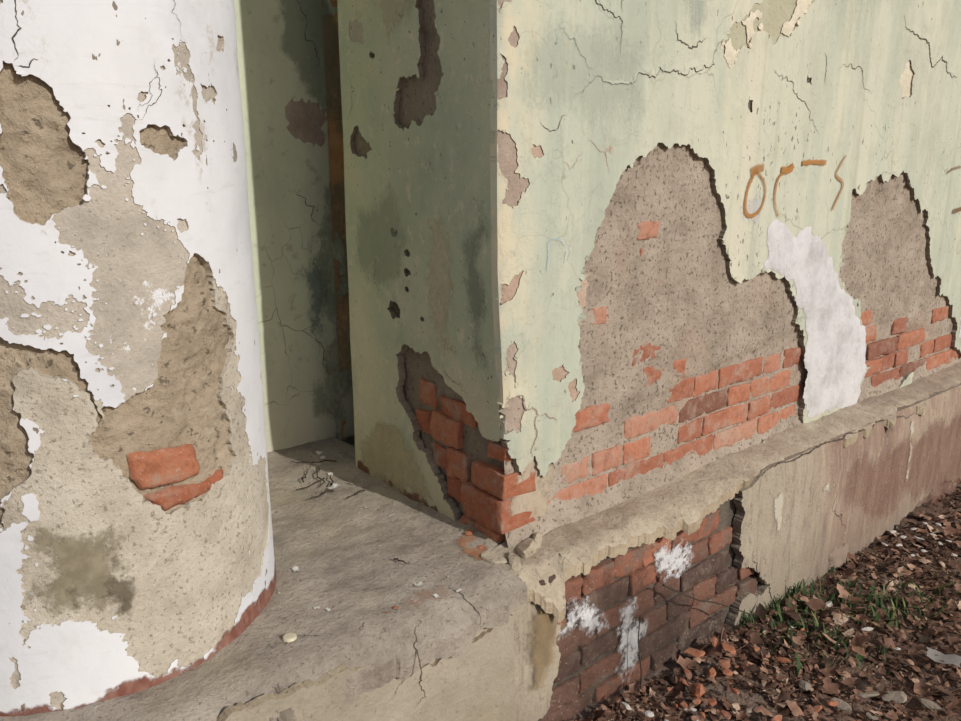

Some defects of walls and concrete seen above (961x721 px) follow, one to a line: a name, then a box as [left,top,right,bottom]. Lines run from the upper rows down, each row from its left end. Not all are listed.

crack [12,0,38,68]
crack [540,0,728,131]
peeling [720,0,814,68]
flaking render [839,173,961,402]
peeling [0,39,269,678]
flaking render [403,143,807,548]
water stain [906,421,914,482]
water stain [33,528,134,613]
crack [413,621,426,704]
water stain [559,596,647,674]
flaking render [538,499,760,721]
water stain [654,544,692,578]